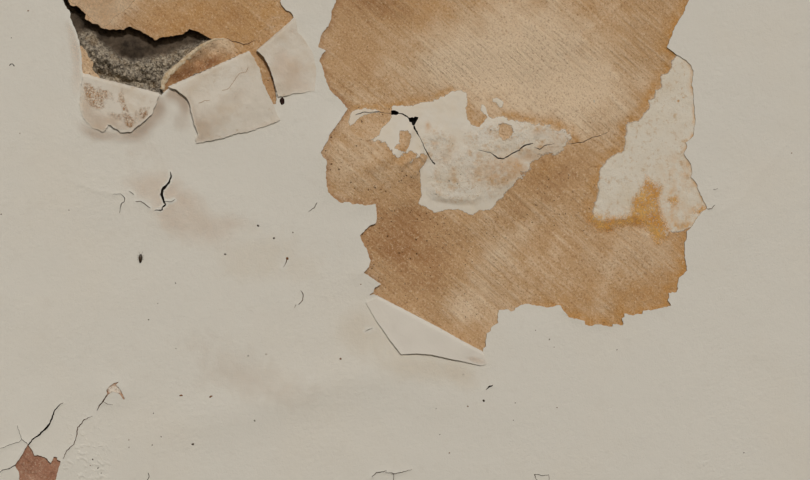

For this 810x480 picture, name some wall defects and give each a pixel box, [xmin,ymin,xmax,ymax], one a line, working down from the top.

crack [356,110,435,164]
crack [119,172,175,213]
peeling [63,0,691,366]
crack [3,403,63,448]
peeling [15,440,65,480]